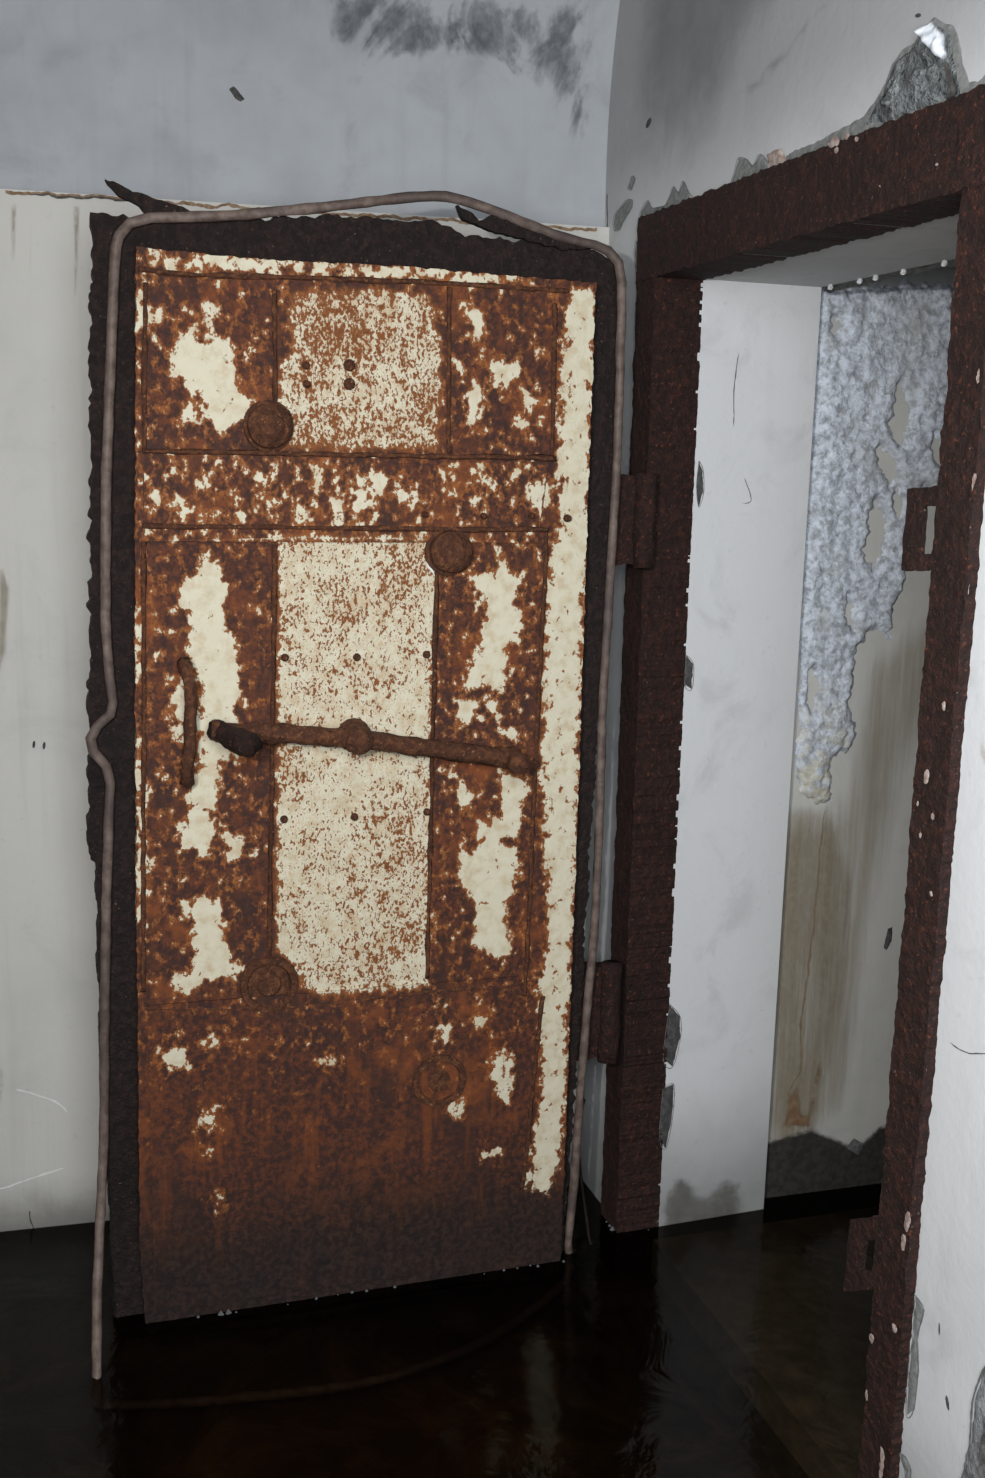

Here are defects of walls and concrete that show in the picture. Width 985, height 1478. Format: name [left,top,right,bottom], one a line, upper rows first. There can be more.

water stain [342,0,521,51]
water stain [538,14,574,88]
spalling [731,13,985,182]
spalling [961,1366,985,1478]